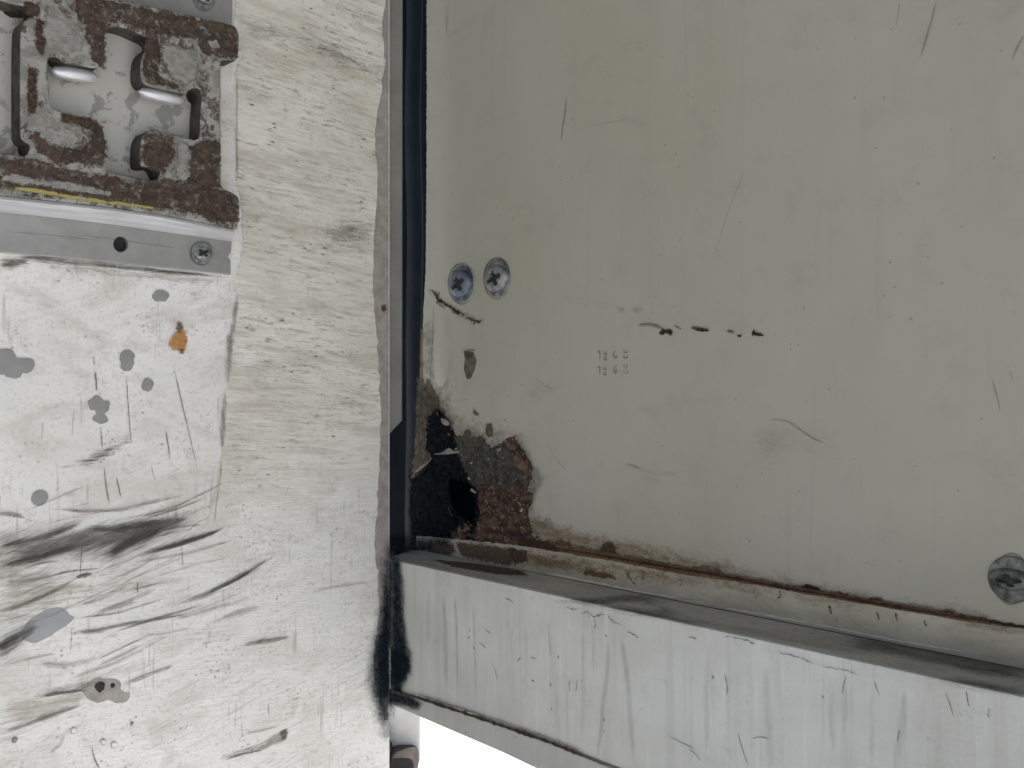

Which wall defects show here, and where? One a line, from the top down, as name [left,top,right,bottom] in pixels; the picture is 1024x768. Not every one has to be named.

rust [24,1,46,55]
rust [75,0,239,89]
rust [27,64,40,114]
rust [0,112,240,224]
peeling [0,349,35,379]
rust [169,321,188,353]
peeling [463,349,477,379]
rust [410,329,440,478]
peeling [415,408,505,472]
rust [431,426,1008,631]
peeling [21,607,74,643]
spalling [42,678,130,703]